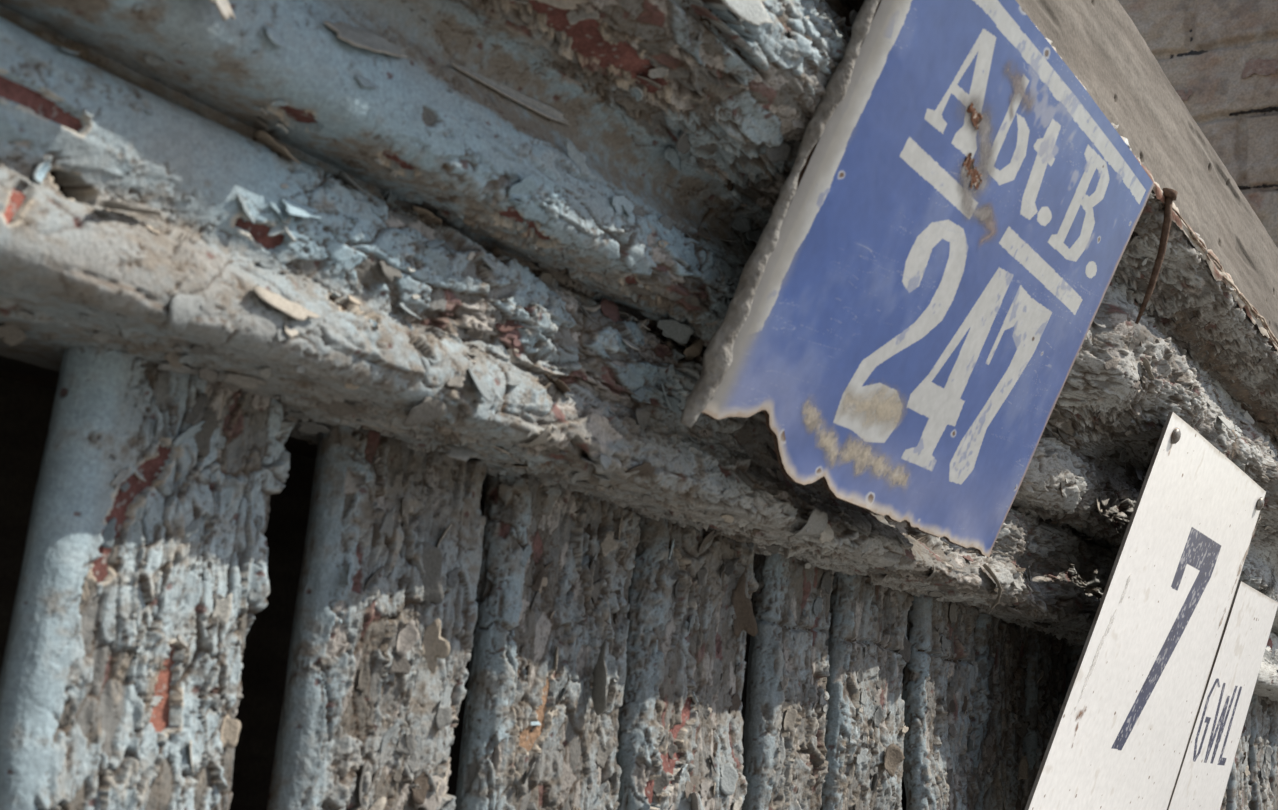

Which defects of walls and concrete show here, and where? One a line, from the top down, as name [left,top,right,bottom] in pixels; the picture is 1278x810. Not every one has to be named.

peeling [210,0,235,21]
peeling [721,0,773,26]
peeling [0,75,93,132]
peeling [3,158,53,224]
peeling [254,284,320,348]
peeling [446,313,524,413]
peeling [752,491,839,617]
peeling [149,634,200,775]
peeling [211,694,241,759]
peeling [351,717,449,810]
peeling [645,692,742,810]
peeling [849,608,912,791]